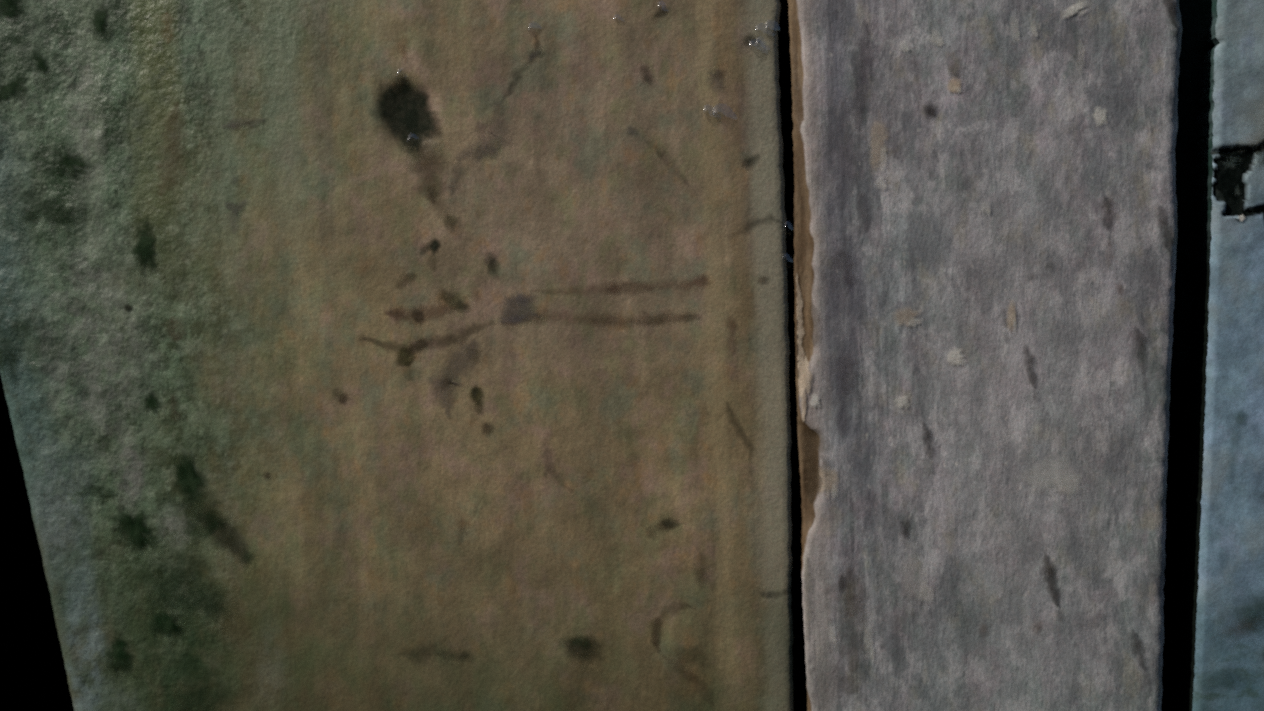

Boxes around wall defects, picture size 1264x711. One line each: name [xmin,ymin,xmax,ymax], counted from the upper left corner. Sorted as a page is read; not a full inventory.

leakage [378,82,437,151]
crack [1219,143,1264,156]
crack [1243,206,1264,216]
leakage [175,456,203,496]